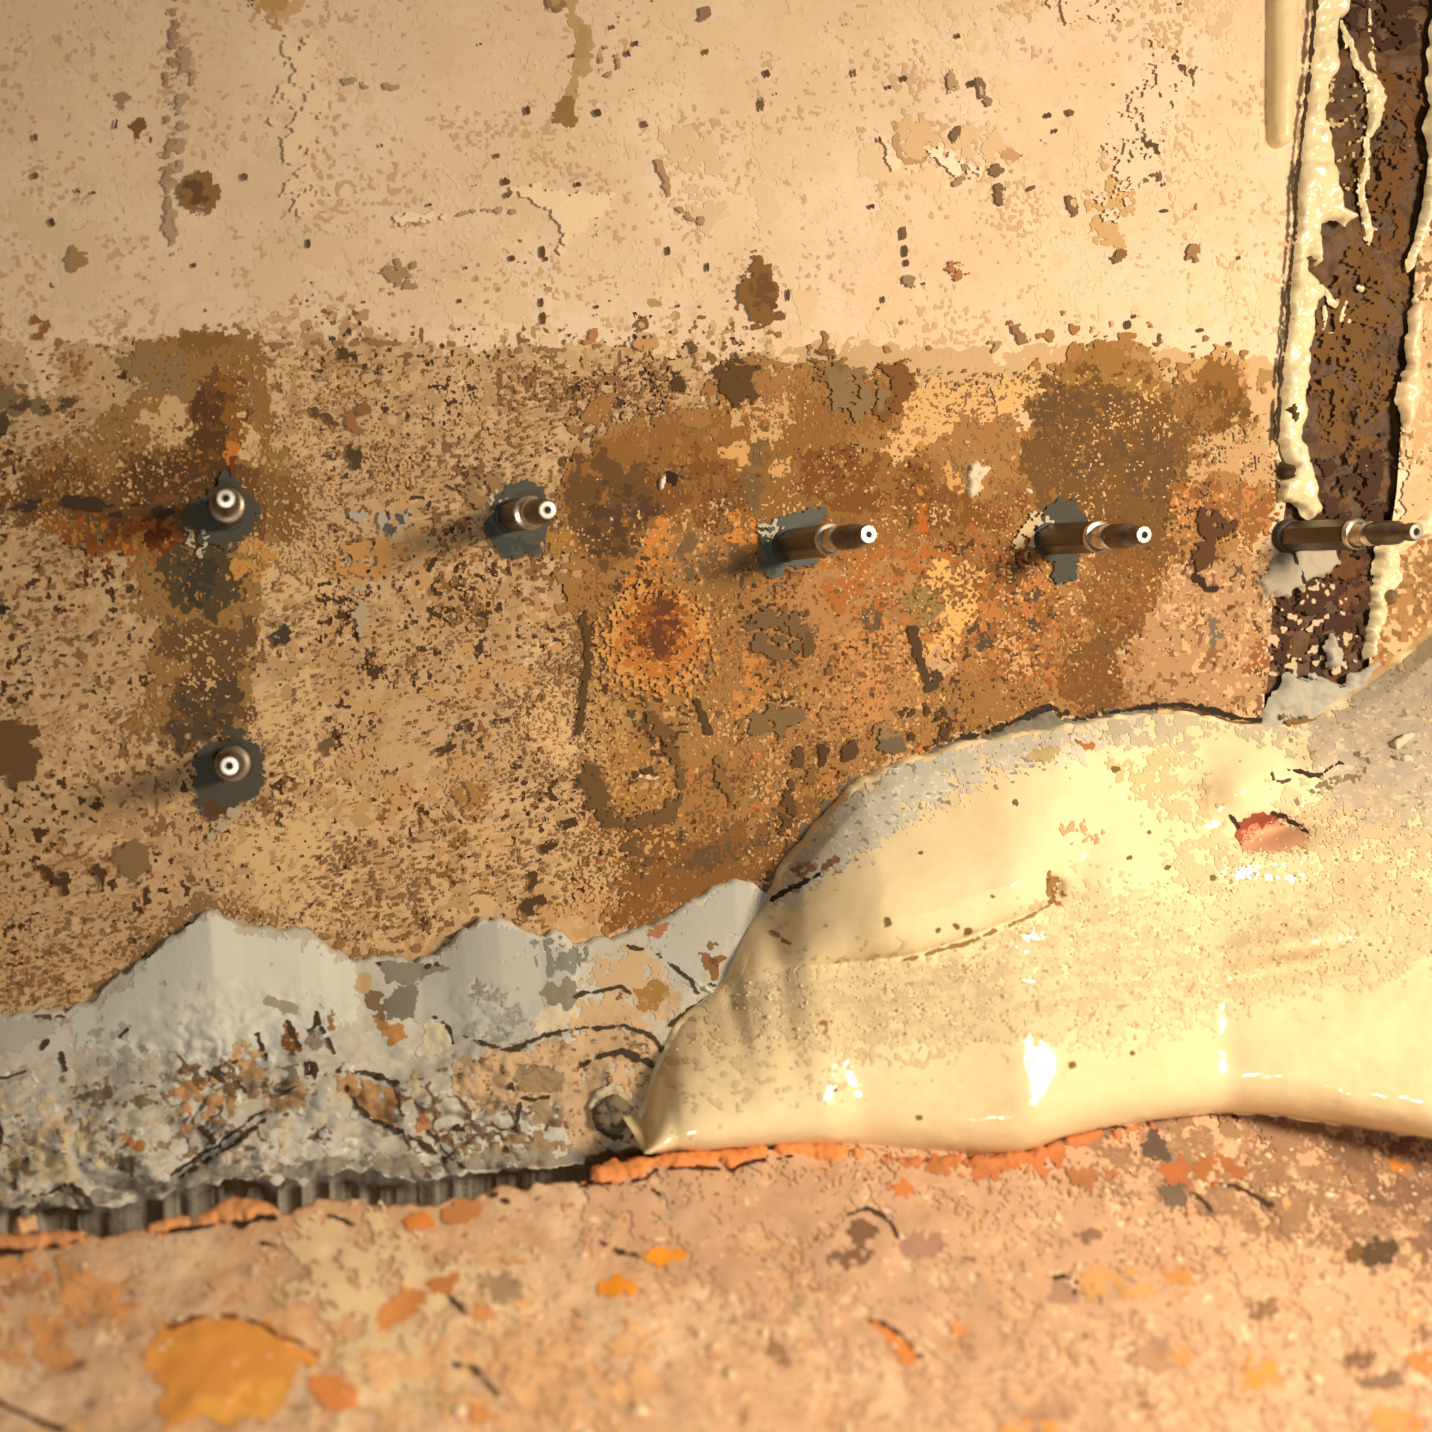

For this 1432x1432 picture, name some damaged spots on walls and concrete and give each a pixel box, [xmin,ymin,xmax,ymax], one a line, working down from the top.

corrosion [1309,65,1428,473]
corrosion [0,323,319,748]
damp [148,541,259,761]
corrosion [554,333,1284,937]
damp [967,561,1058,670]
damp [1190,506,1238,592]
corrosion [1313,550,1372,615]
corrosion [1369,537,1432,675]
damp [0,719,43,788]
damp [512,674,972,933]
damp [89,891,422,994]
crack [489,1191,511,1204]